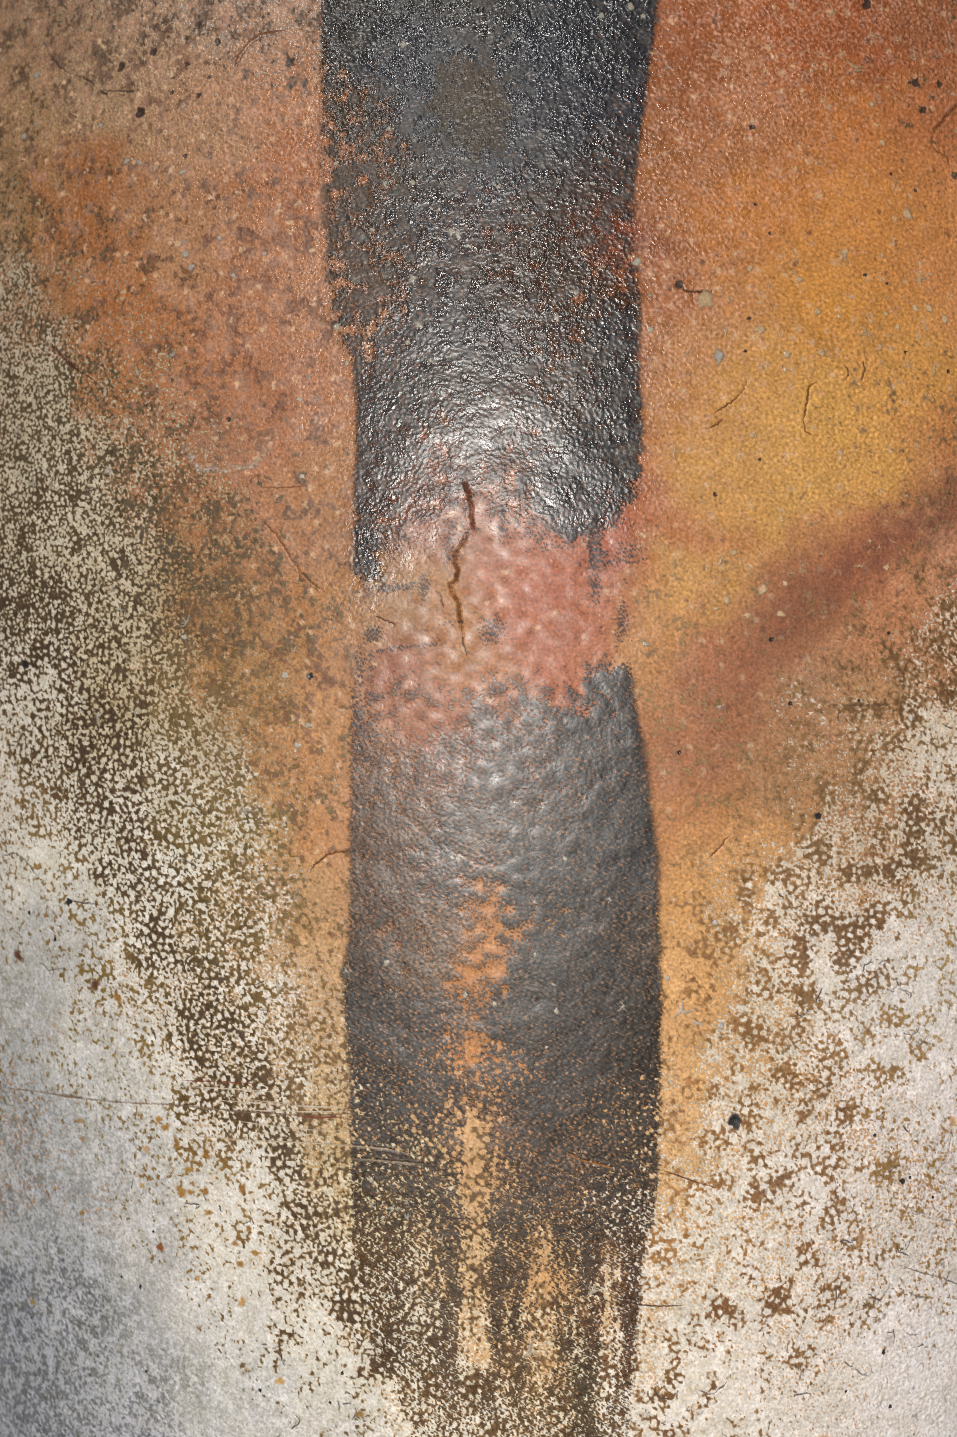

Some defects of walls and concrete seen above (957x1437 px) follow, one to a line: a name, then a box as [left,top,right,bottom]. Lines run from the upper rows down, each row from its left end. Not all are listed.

leakage [38,0,280,59]
leakage [85,204,118,284]
leakage [153,306,212,383]
leakage [261,0,658,594]
leakage [798,340,957,473]
crack [441,481,475,654]
leakage [631,541,827,666]
rust [375,1373,485,1437]